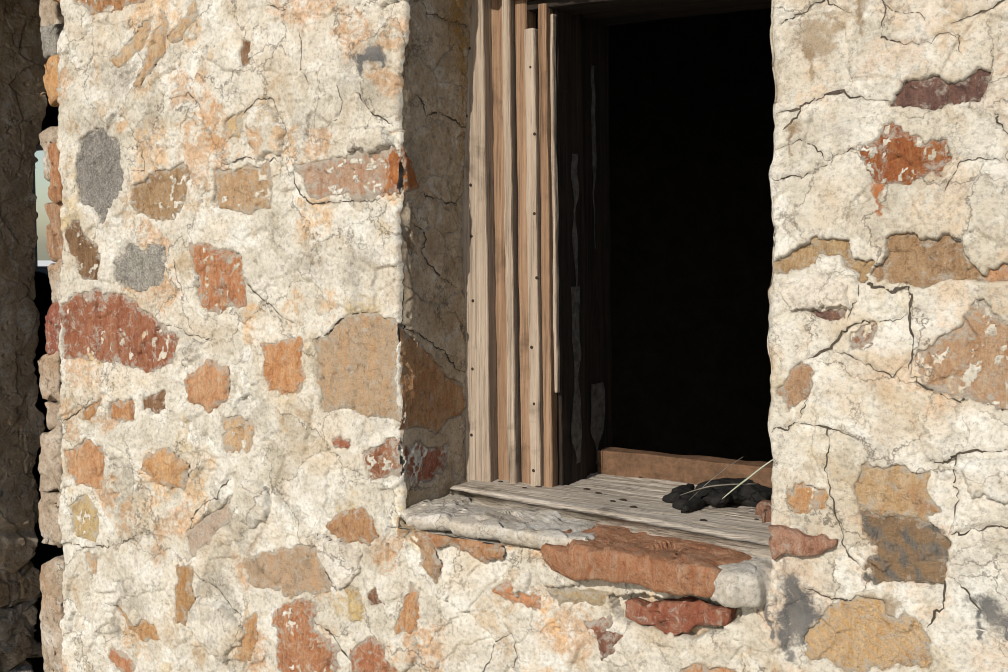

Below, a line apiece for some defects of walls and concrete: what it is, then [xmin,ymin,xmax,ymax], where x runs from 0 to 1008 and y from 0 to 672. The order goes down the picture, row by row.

crack [781,0,849,24]
crack [880,0,1005,55]
crack [221,97,379,205]
crack [326,85,393,129]
crack [410,95,466,128]
crack [772,89,889,181]
crack [945,113,1008,190]
crack [808,282,1004,411]
crack [771,396,867,601]
crack [930,449,1008,536]
crack [927,577,981,627]
crack [482,633,518,672]